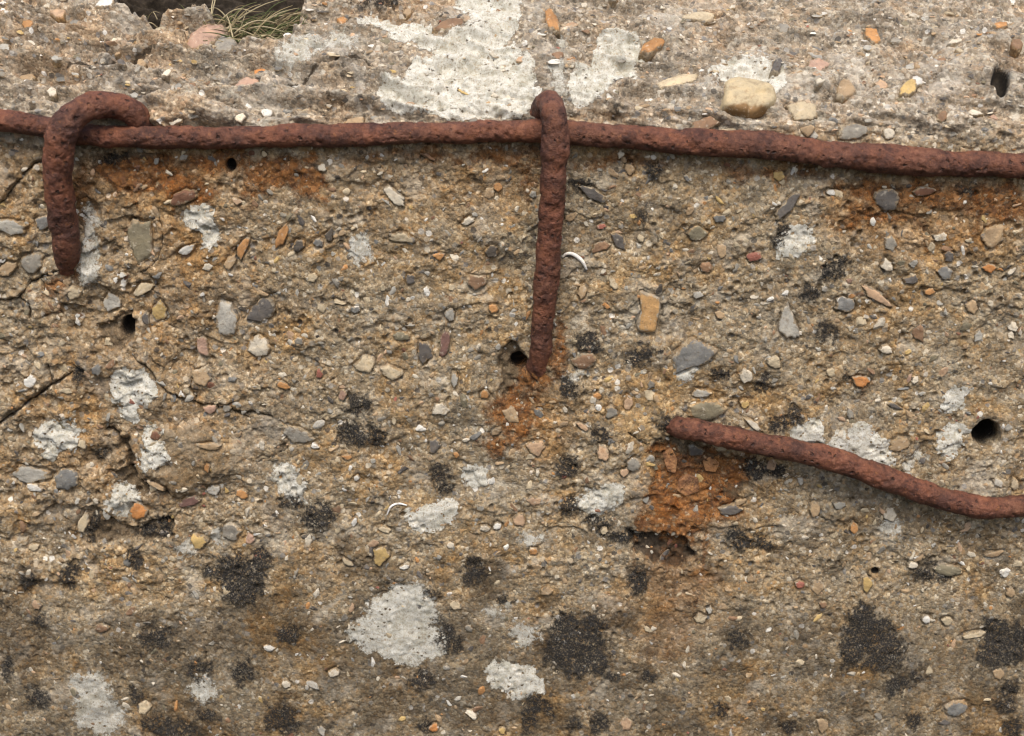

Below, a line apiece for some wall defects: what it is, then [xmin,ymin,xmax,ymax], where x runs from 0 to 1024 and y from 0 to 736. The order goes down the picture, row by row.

rust [72,148,330,220]
rust [391,143,541,191]
rust [834,176,1024,232]
rust [45,269,78,297]
spalling [57,262,83,288]
spalling [100,310,135,349]
crack [0,364,73,422]
spalling [499,340,531,402]
rust [482,317,568,459]